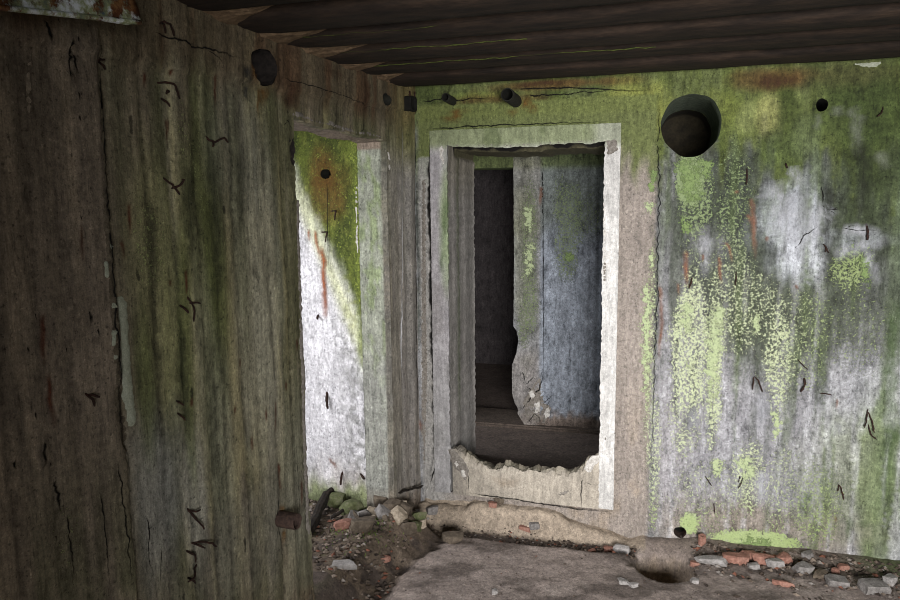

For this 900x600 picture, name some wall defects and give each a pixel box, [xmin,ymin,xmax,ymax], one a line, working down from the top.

crack [156,32,230,60]
crack [523,87,626,97]
crack [436,121,587,129]
rust [308,231,326,308]
crack [42,18,162,581]
crack [650,120,661,459]
spalling [523,378,551,423]
spalling [448,448,469,480]
spalling [584,455,600,472]